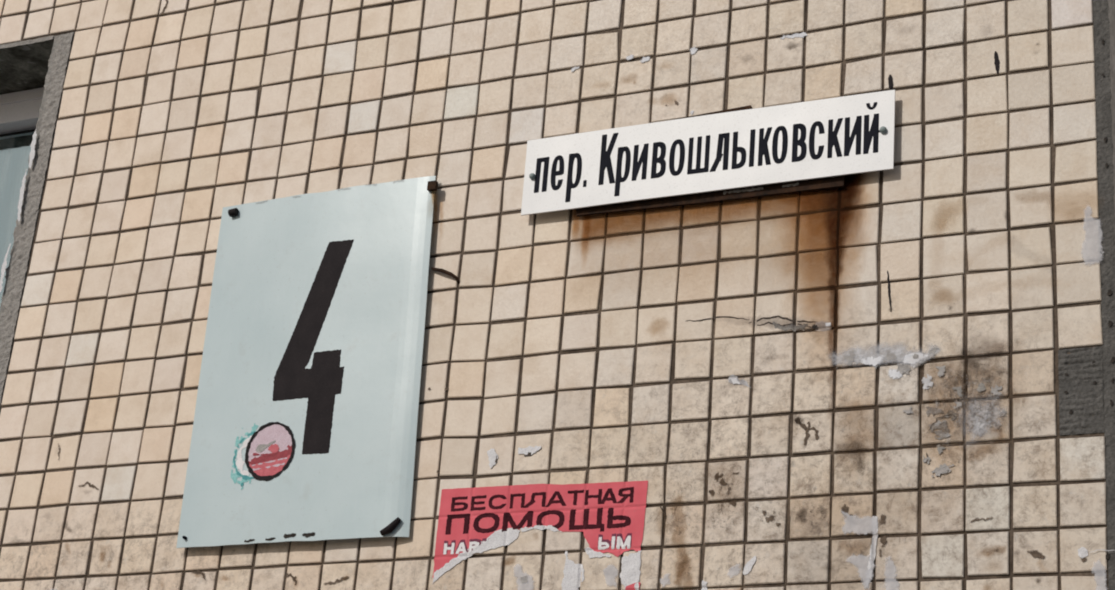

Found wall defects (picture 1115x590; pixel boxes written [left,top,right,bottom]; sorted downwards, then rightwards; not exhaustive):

corrosion [828,174,858,313]
spalling [1058,346,1115,436]